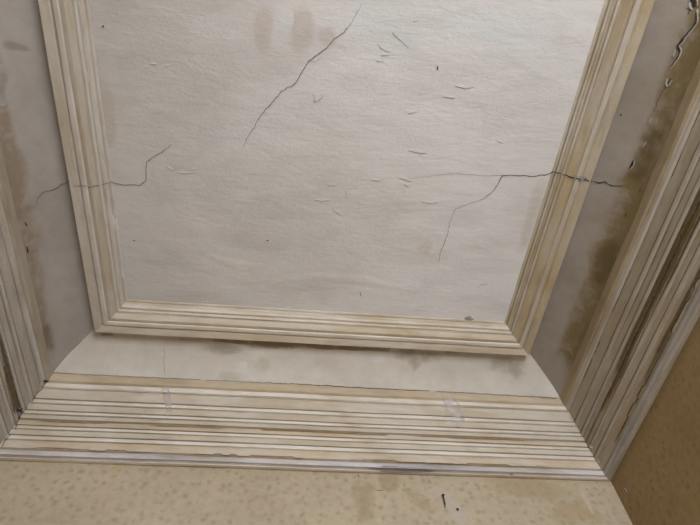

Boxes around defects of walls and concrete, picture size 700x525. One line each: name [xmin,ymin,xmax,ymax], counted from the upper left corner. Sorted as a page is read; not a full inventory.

crack [243,5,361,147]
leakage [0,38,58,362]
crack [30,146,170,208]
crack [438,171,627,262]
leakage [553,0,700,396]
leakage [617,267,700,437]